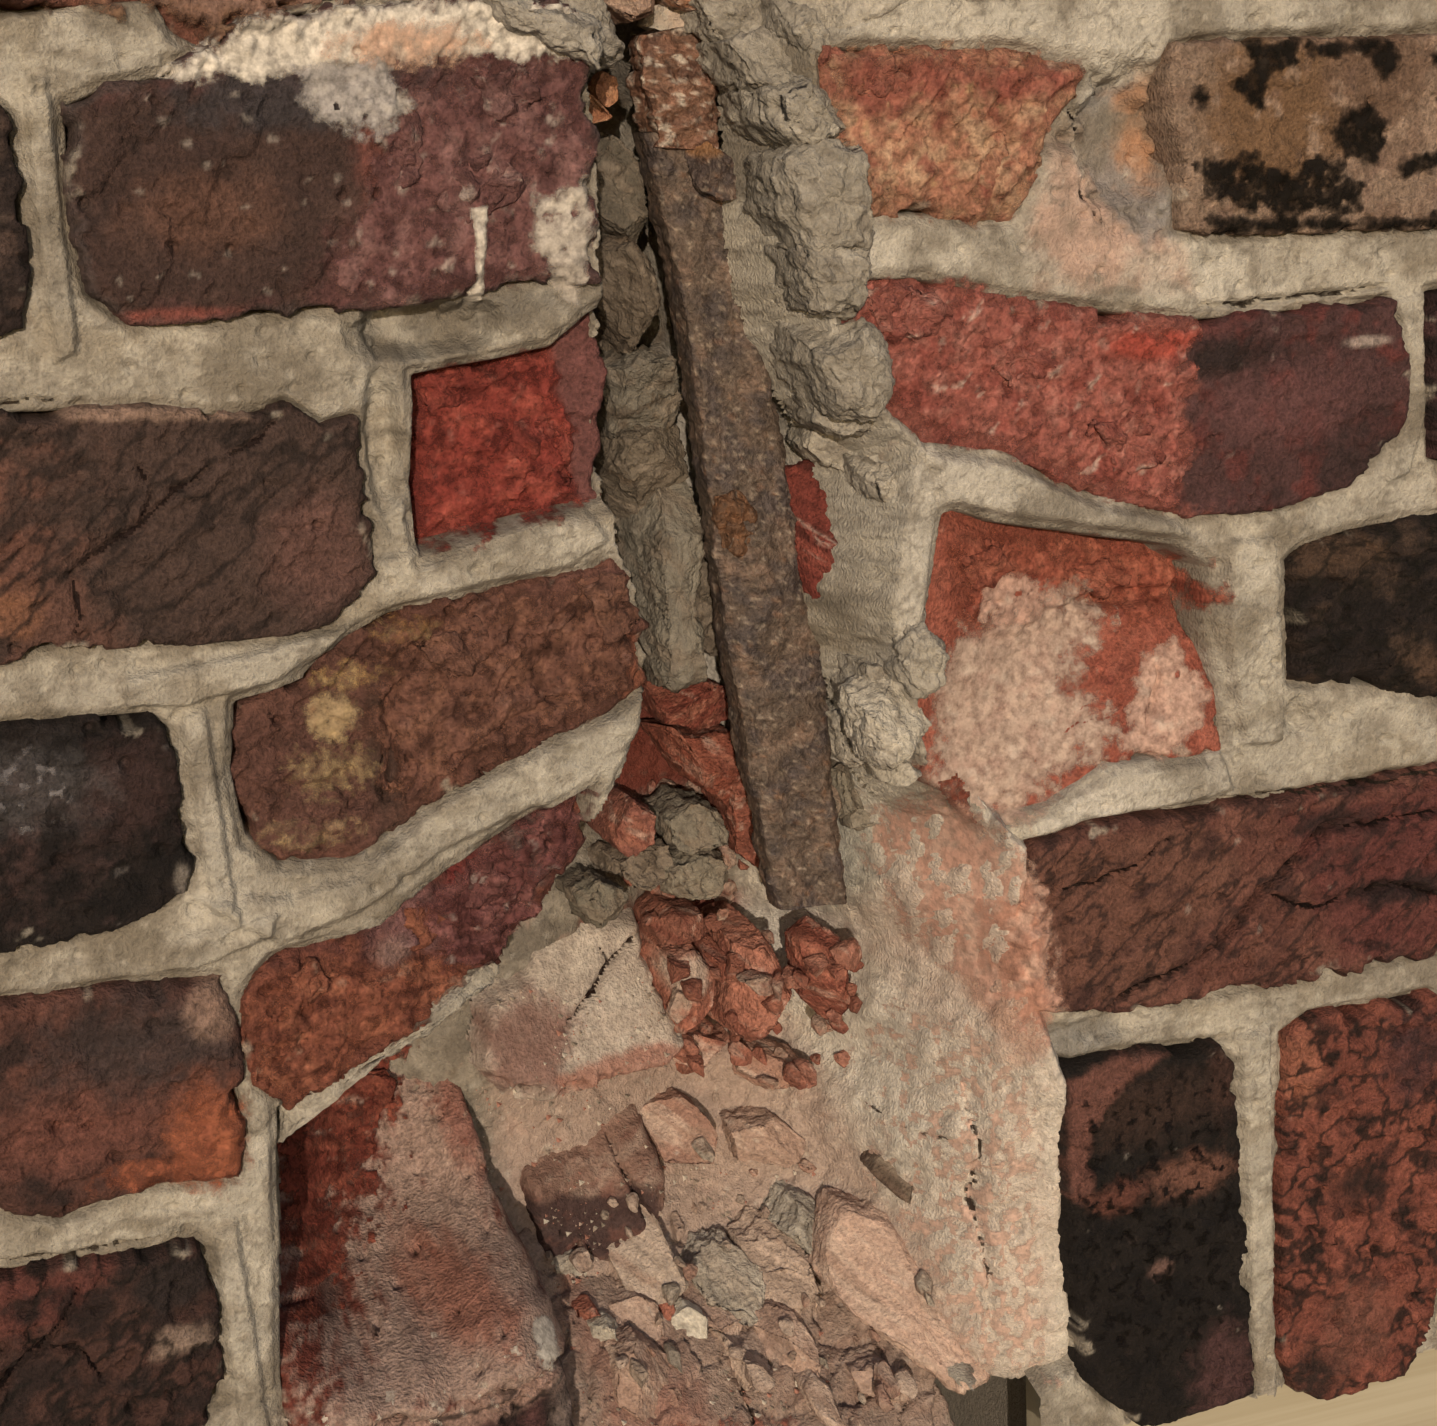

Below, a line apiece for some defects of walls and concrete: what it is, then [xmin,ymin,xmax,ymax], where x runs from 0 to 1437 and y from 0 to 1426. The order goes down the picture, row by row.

spalling [332,58,599,306]
corrosion [684,141,737,201]
spalling [827,41,1086,226]
spalling [409,349,589,552]
corrosion [711,490,758,558]
spalling [855,278,1203,509]
spalling [361,571,640,801]
spalling [243,789,598,1325]
crack [566,935,633,1021]
spalling [860,1150,914,1204]